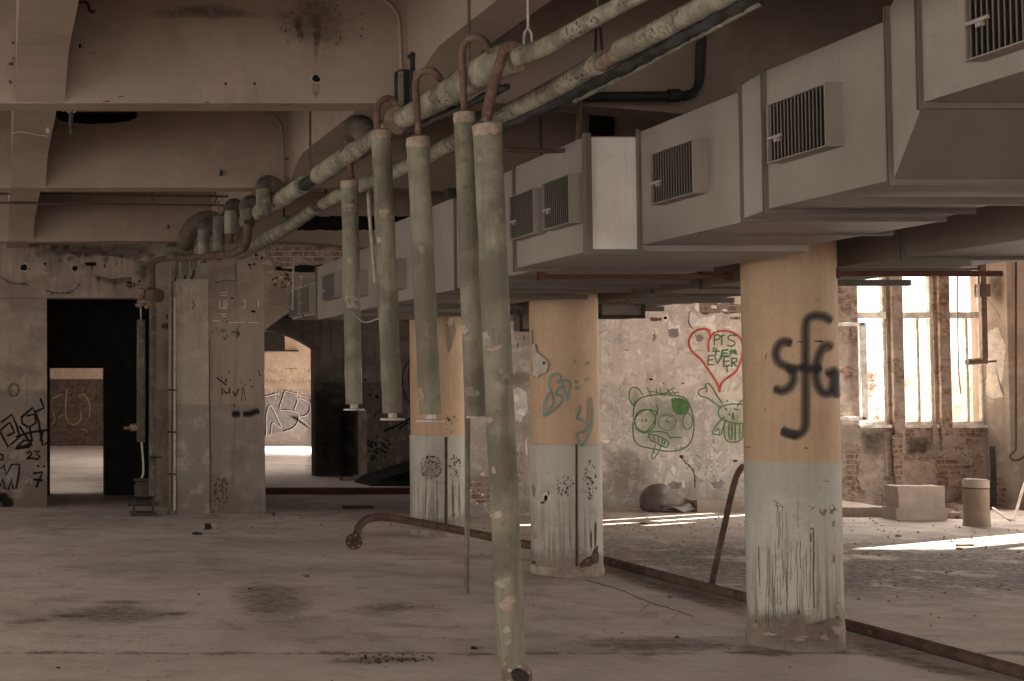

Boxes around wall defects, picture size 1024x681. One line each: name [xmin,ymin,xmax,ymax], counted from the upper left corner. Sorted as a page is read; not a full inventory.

flaking render [248,243,353,289]
flaking render [845,425,984,490]
flaking render [750,602,845,645]